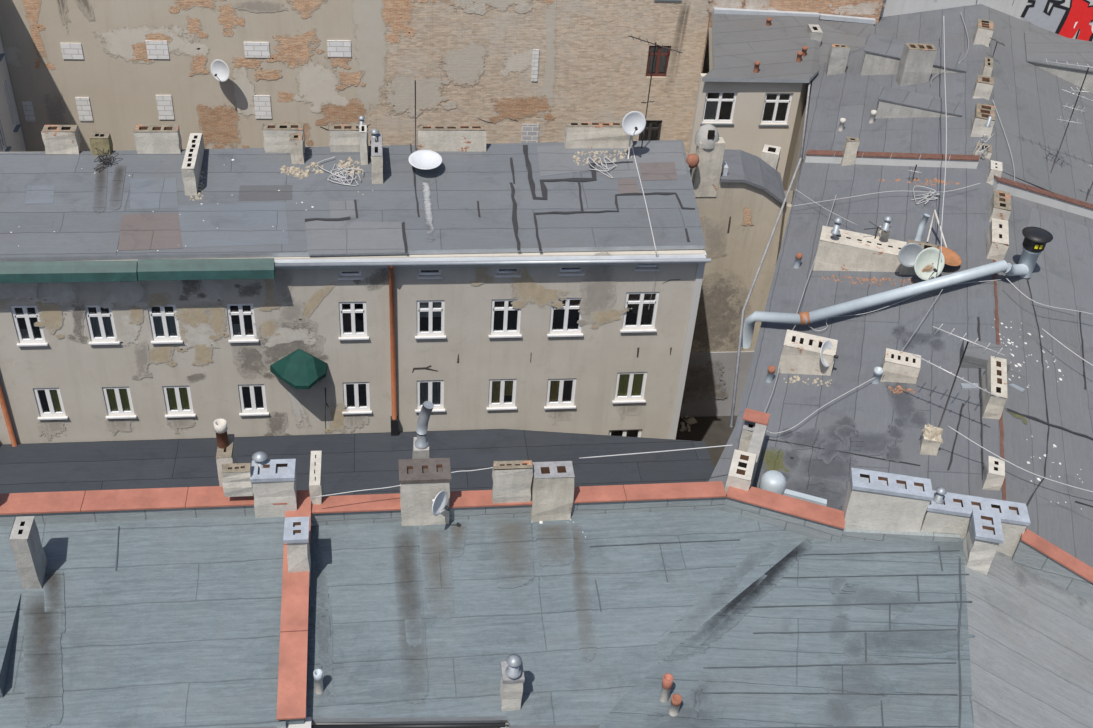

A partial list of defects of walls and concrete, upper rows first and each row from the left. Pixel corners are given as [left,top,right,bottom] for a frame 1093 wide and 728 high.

peeling [22,0,55,72]
damp [57,0,95,33]
peeling [90,0,245,76]
peeling [380,0,456,43]
damp [43,568,65,633]
damp [405,522,467,647]
damp [493,519,596,663]